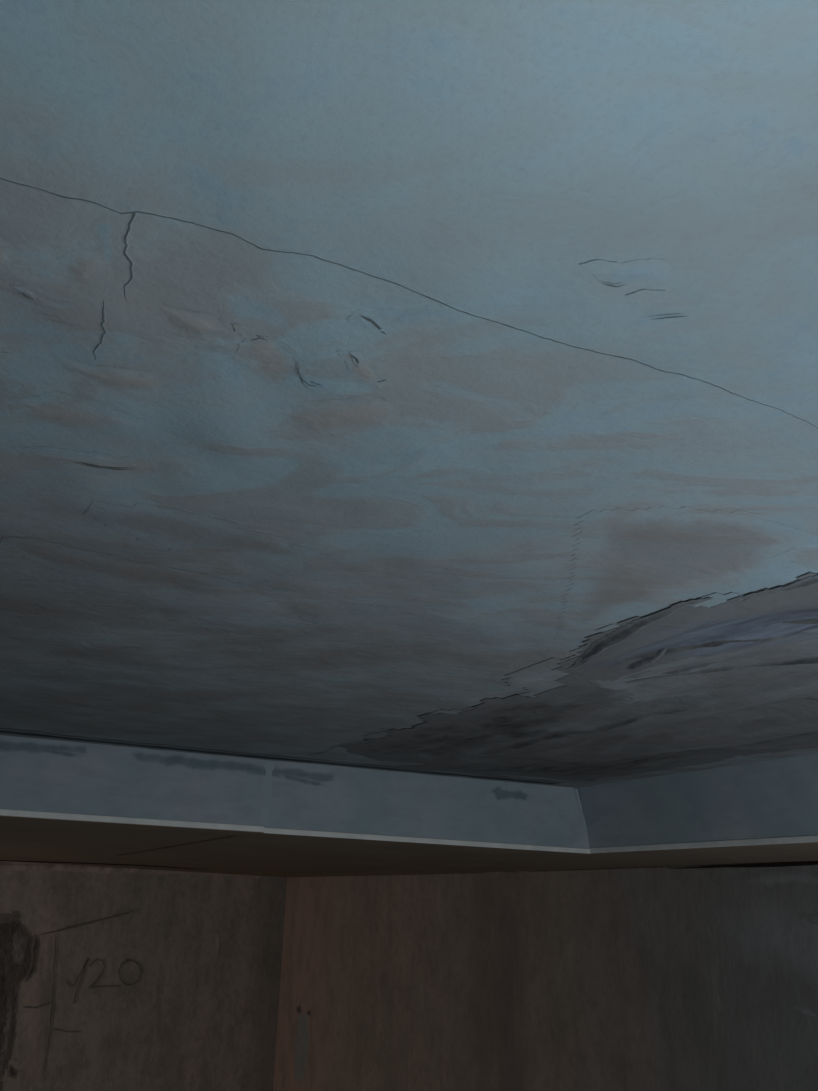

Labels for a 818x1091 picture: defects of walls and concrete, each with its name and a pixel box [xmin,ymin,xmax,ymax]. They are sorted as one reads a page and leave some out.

crack [0,176,818,428]
damp [0,737,95,761]
damp [125,506,818,803]